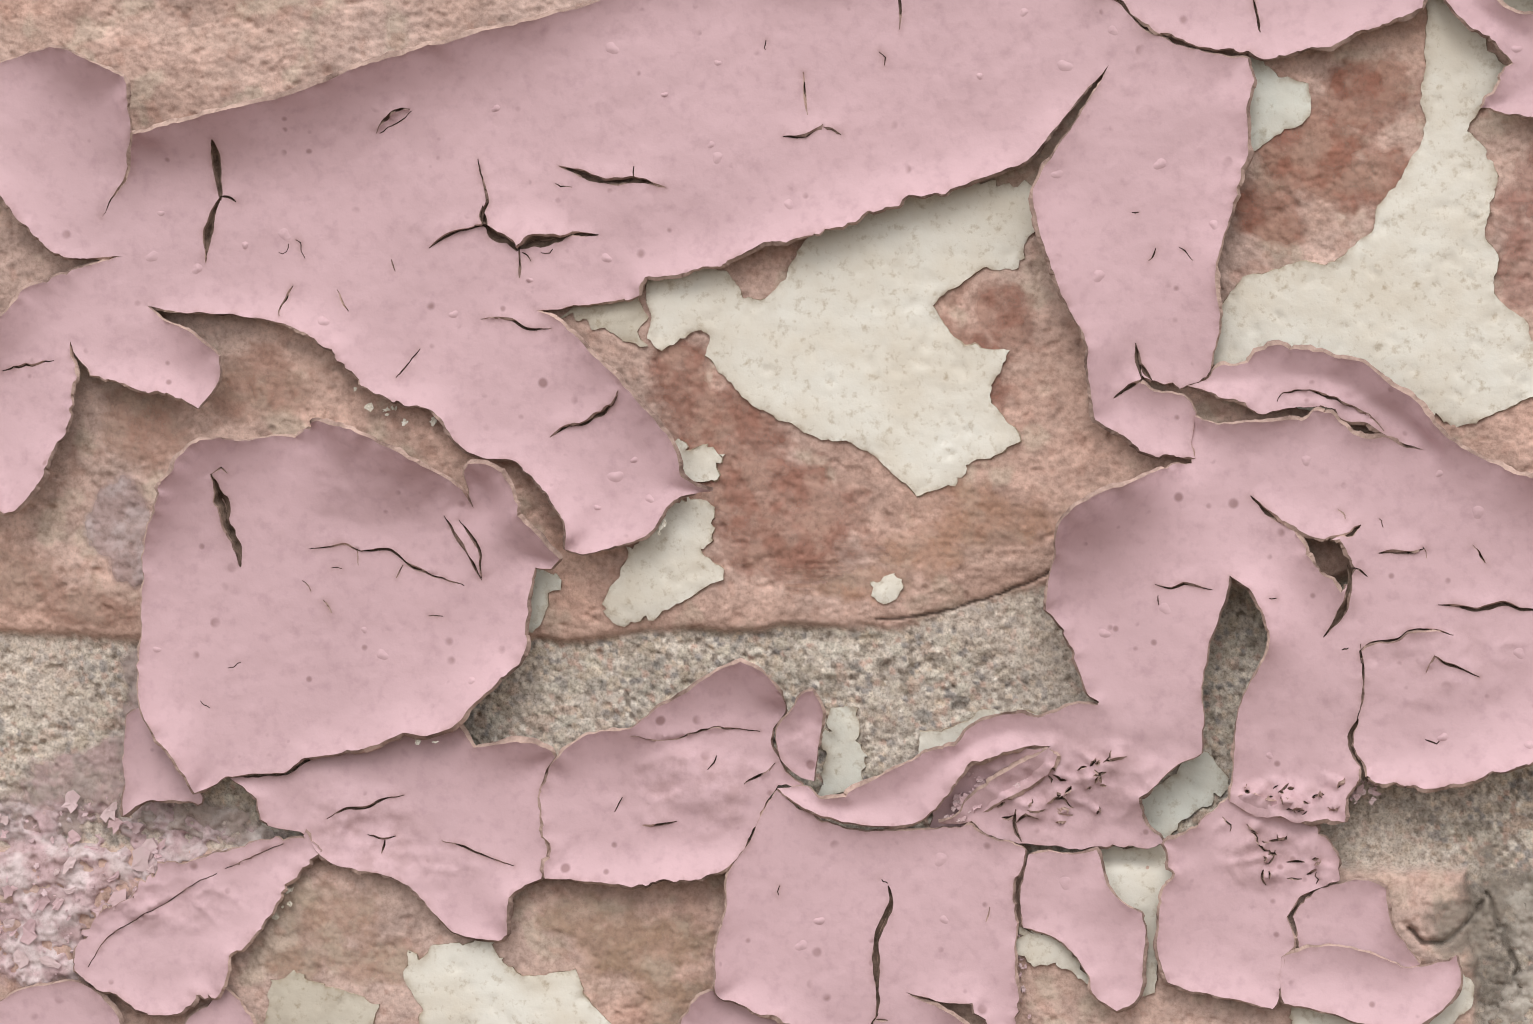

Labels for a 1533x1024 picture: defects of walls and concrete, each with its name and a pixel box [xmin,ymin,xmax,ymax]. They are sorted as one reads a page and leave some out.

crack [204,140,235,253]
crack [434,160,599,257]
crack [557,167,651,187]
peeling [1443,0,1533,314]
peeling [0,0,1428,580]
crack [211,467,242,566]
crack [320,519,482,578]
peeling [0,418,563,1024]
peeling [538,340,1533,1024]
crack [871,880,893,1024]